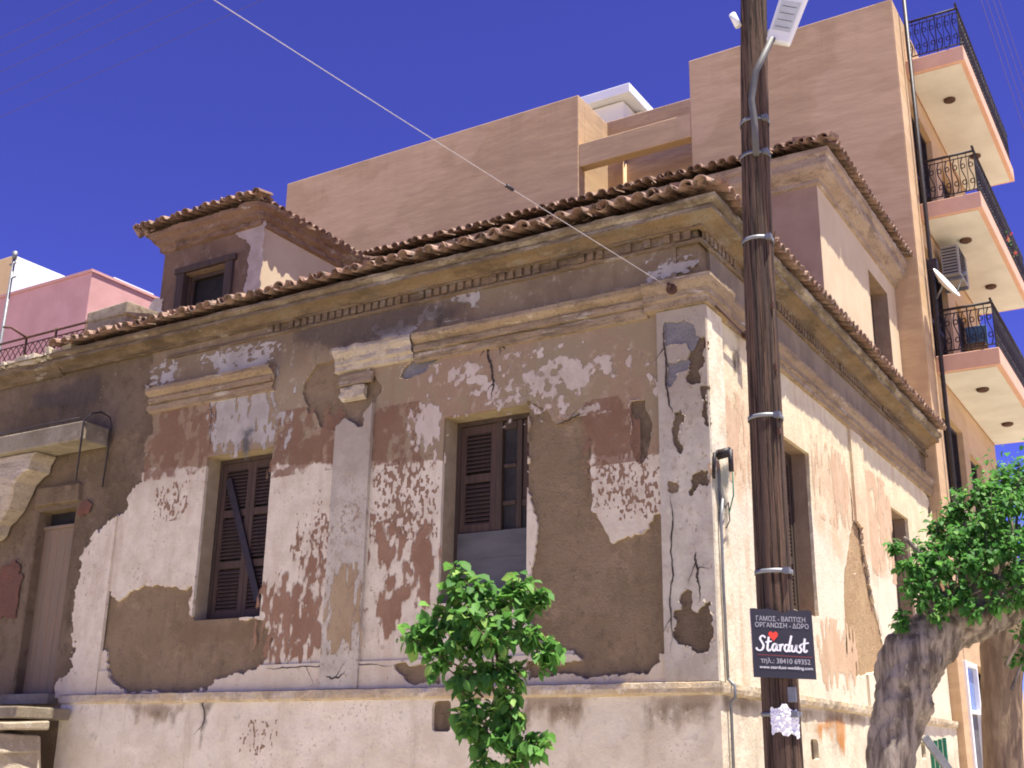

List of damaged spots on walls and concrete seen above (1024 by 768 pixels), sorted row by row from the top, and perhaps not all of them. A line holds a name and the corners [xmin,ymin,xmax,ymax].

peeling [645,254,699,283]
crack [479,346,505,398]
crack [657,325,673,414]
flaking render [0,320,751,695]
crack [663,500,708,651]
flaking render [810,434,897,694]